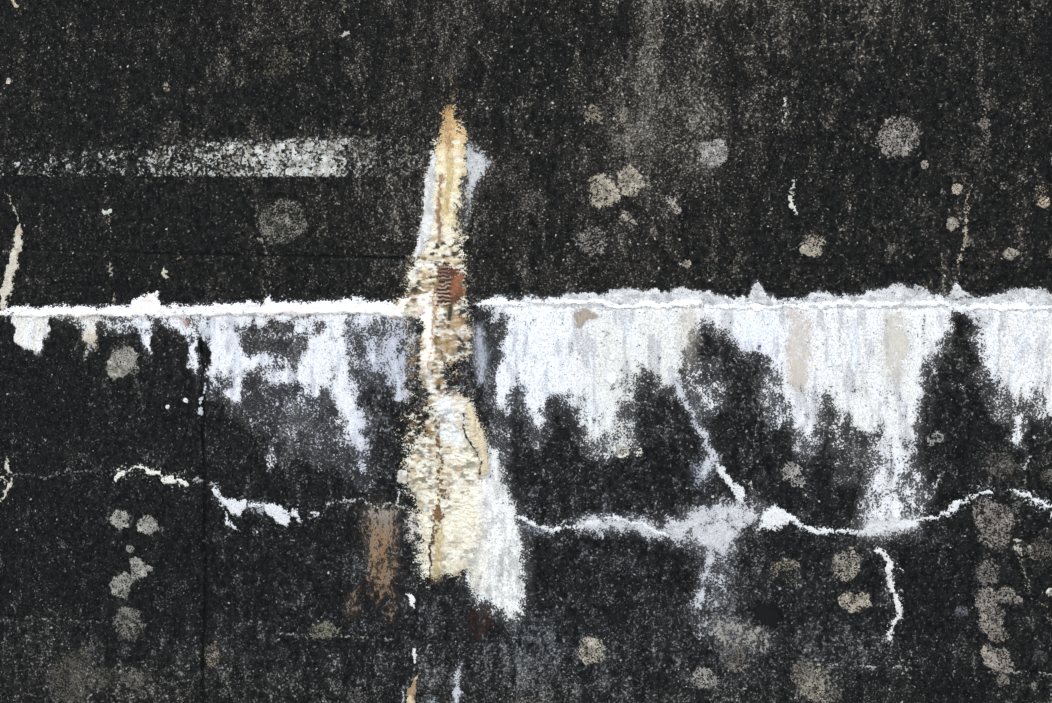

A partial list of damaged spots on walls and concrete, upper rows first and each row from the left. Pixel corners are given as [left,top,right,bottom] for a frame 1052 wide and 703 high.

crack [0,192,23,314]
crack [102,209,112,232]
damp [0,76,1052,628]
crack [0,333,406,703]
crack [505,366,1052,670]